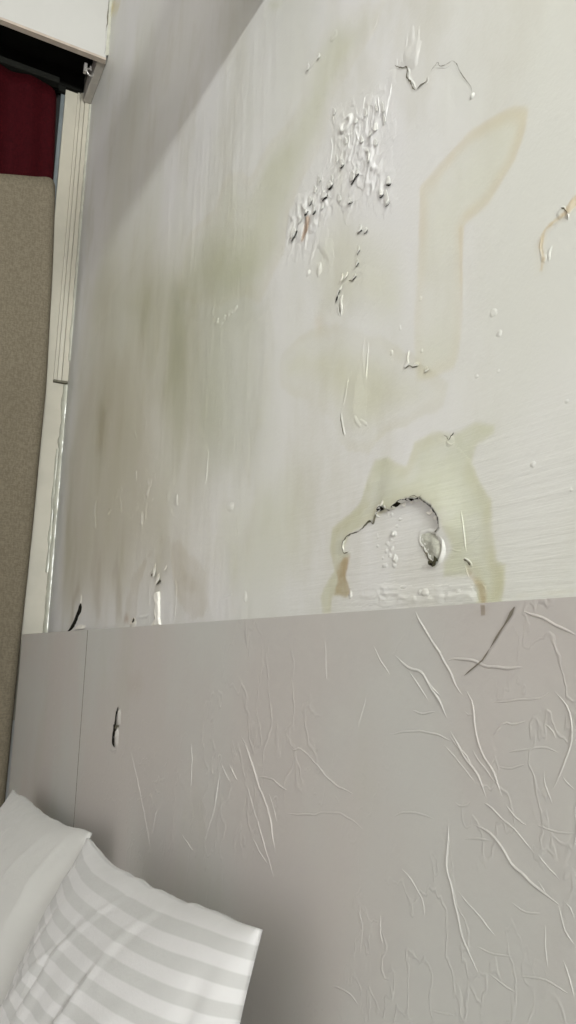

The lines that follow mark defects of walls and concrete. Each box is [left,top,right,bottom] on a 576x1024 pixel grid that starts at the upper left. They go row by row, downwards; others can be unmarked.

crack [395,26,472,135]
peeling [282,67,398,272]
peeling [556,196,575,220]
spalling [419,528,446,568]